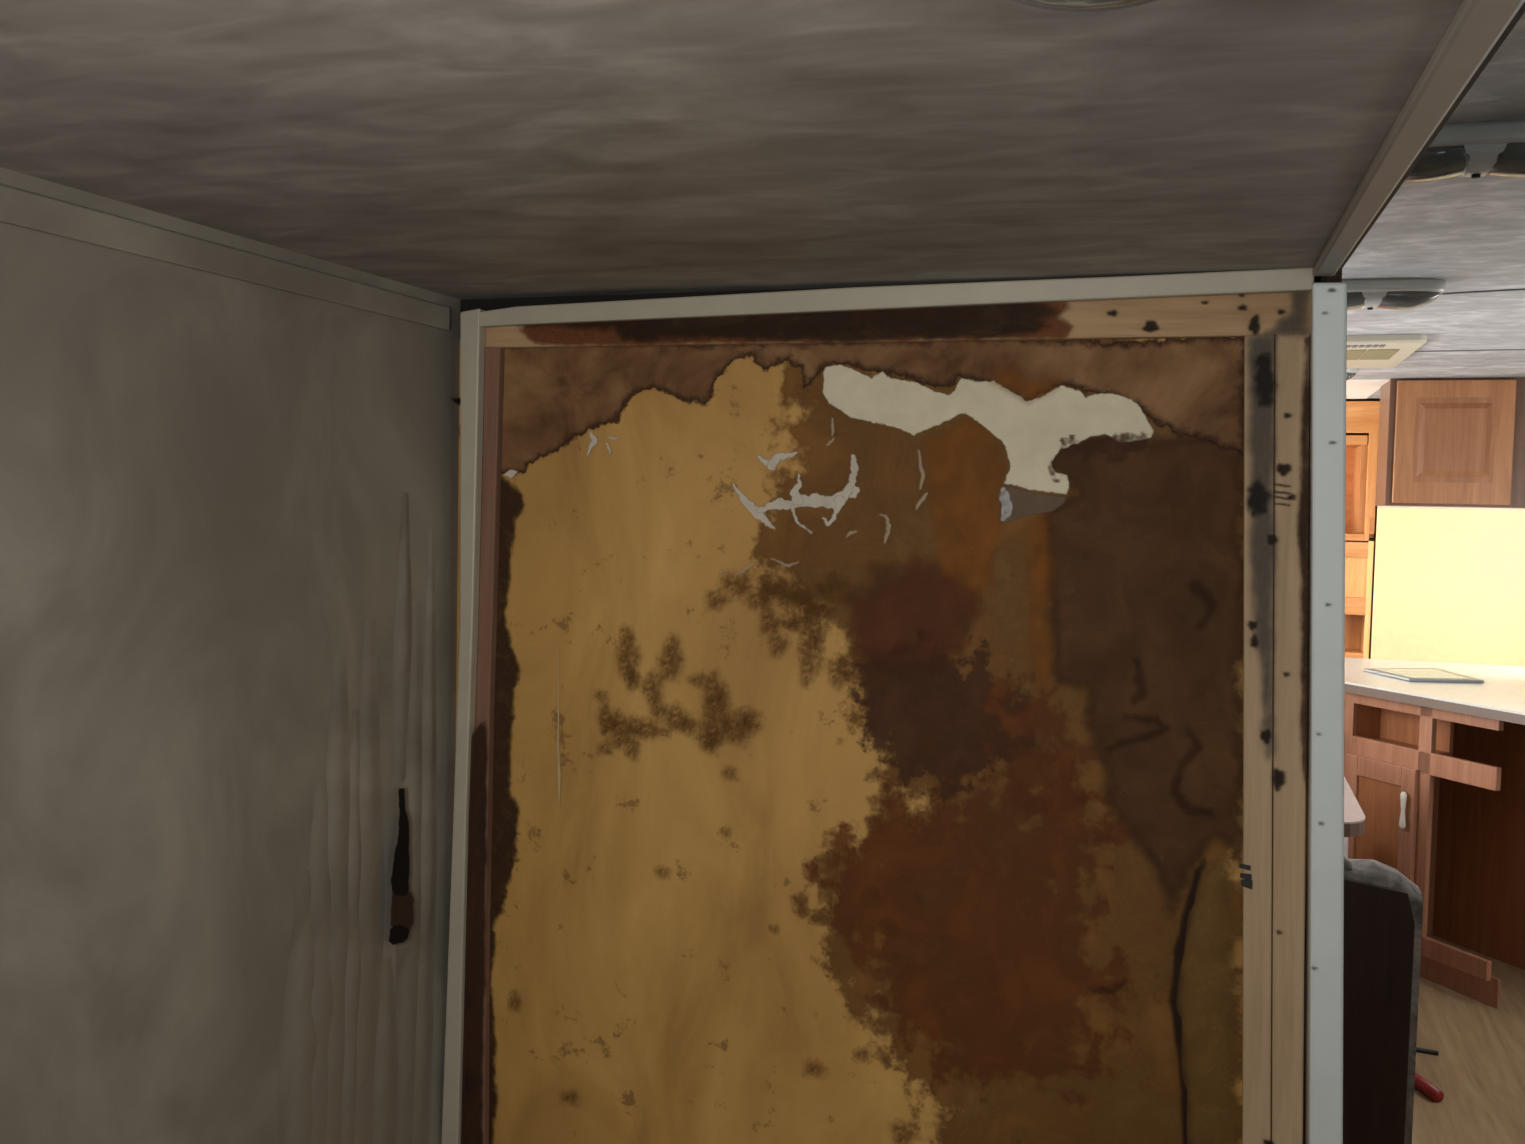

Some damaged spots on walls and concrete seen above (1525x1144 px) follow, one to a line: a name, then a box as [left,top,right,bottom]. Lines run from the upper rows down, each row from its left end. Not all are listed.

water stain [461,292,1311,1144]
peeling [823,365,1154,522]